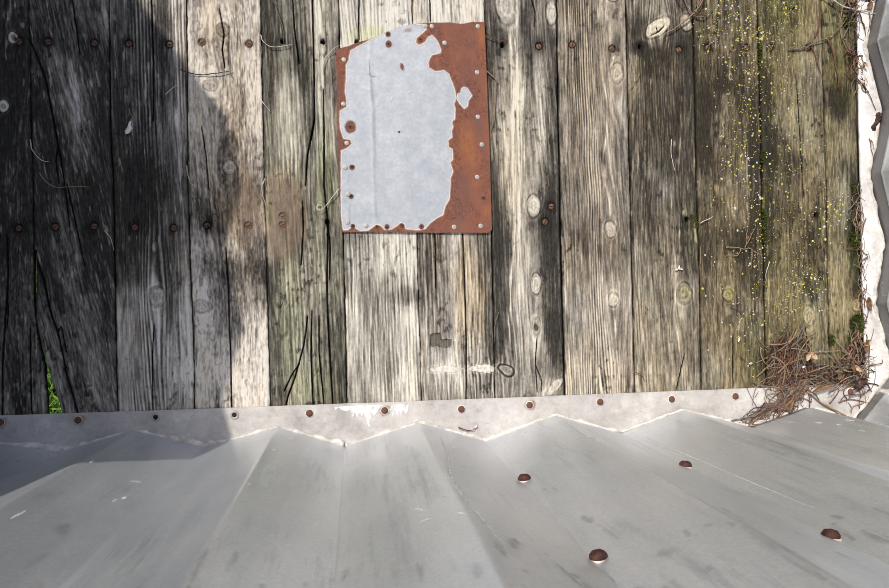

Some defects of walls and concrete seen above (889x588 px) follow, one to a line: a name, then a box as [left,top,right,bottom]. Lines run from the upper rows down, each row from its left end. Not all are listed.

corrosion [336,22,492,233]
crack [1,236,9,415]
crack [27,328,35,414]
crack [36,257,79,413]